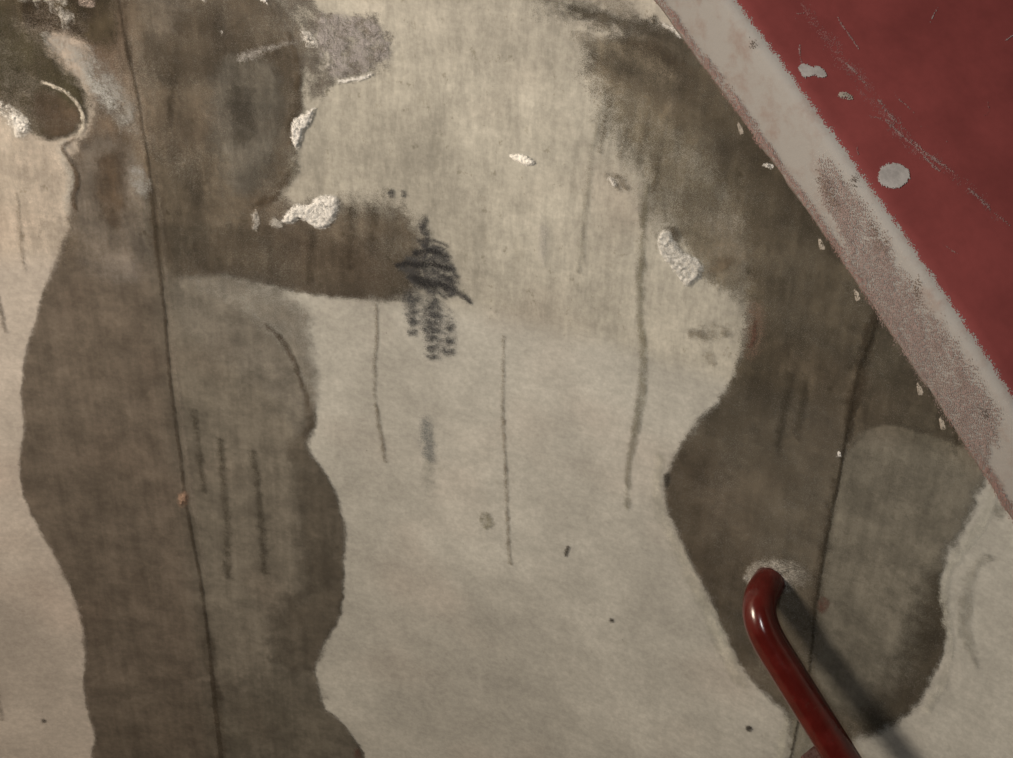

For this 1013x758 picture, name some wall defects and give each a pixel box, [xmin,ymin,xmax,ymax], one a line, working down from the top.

flaking render [41,81,86,215]
crack [117,0,228,758]
water stain [0,0,435,758]
peeling [251,195,340,231]
peeling [287,108,316,178]
water stain [575,22,1006,744]